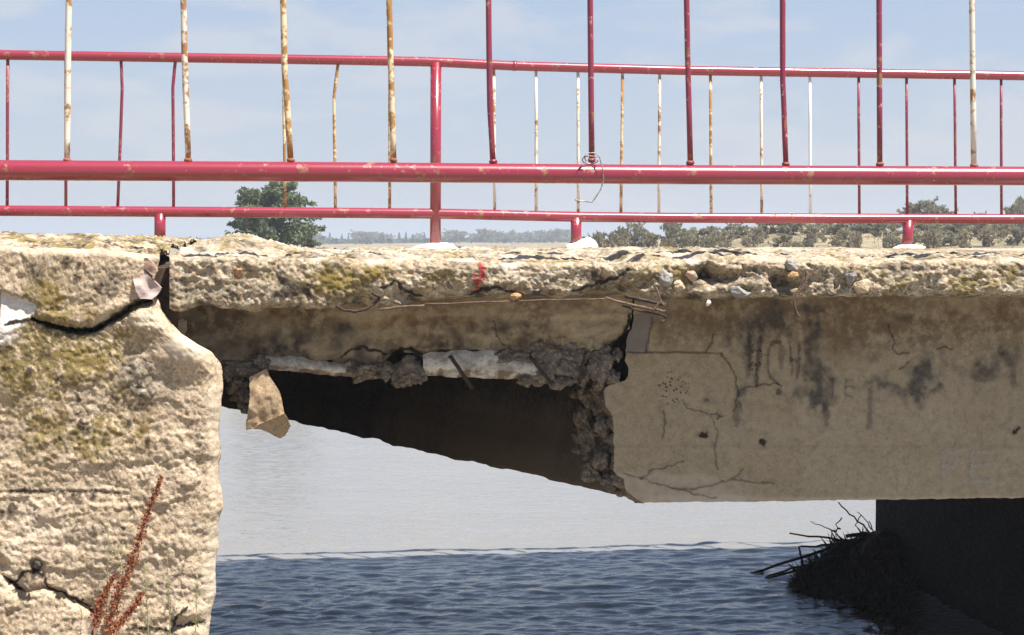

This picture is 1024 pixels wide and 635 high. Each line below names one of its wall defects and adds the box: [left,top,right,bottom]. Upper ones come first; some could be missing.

spalling [0,292,37,344]
crack [4,299,152,334]
crack [605,313,779,412]
spalling [255,341,644,504]
crack [4,569,97,635]